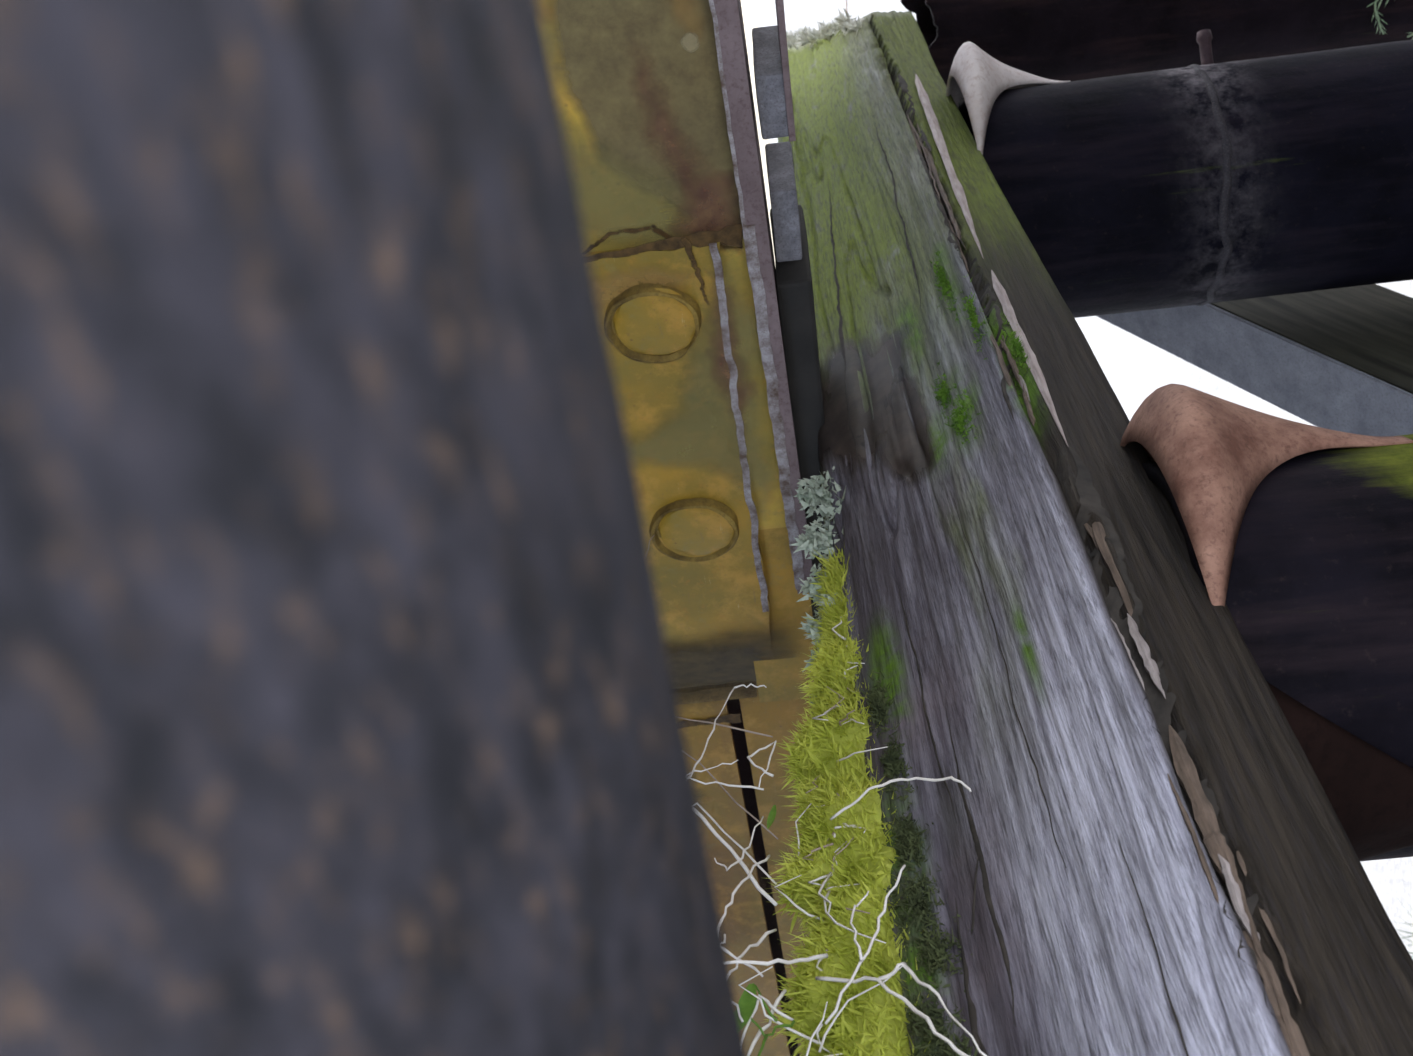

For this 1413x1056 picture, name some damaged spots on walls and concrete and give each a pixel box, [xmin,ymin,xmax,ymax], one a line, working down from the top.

leakage [553,0,741,242]